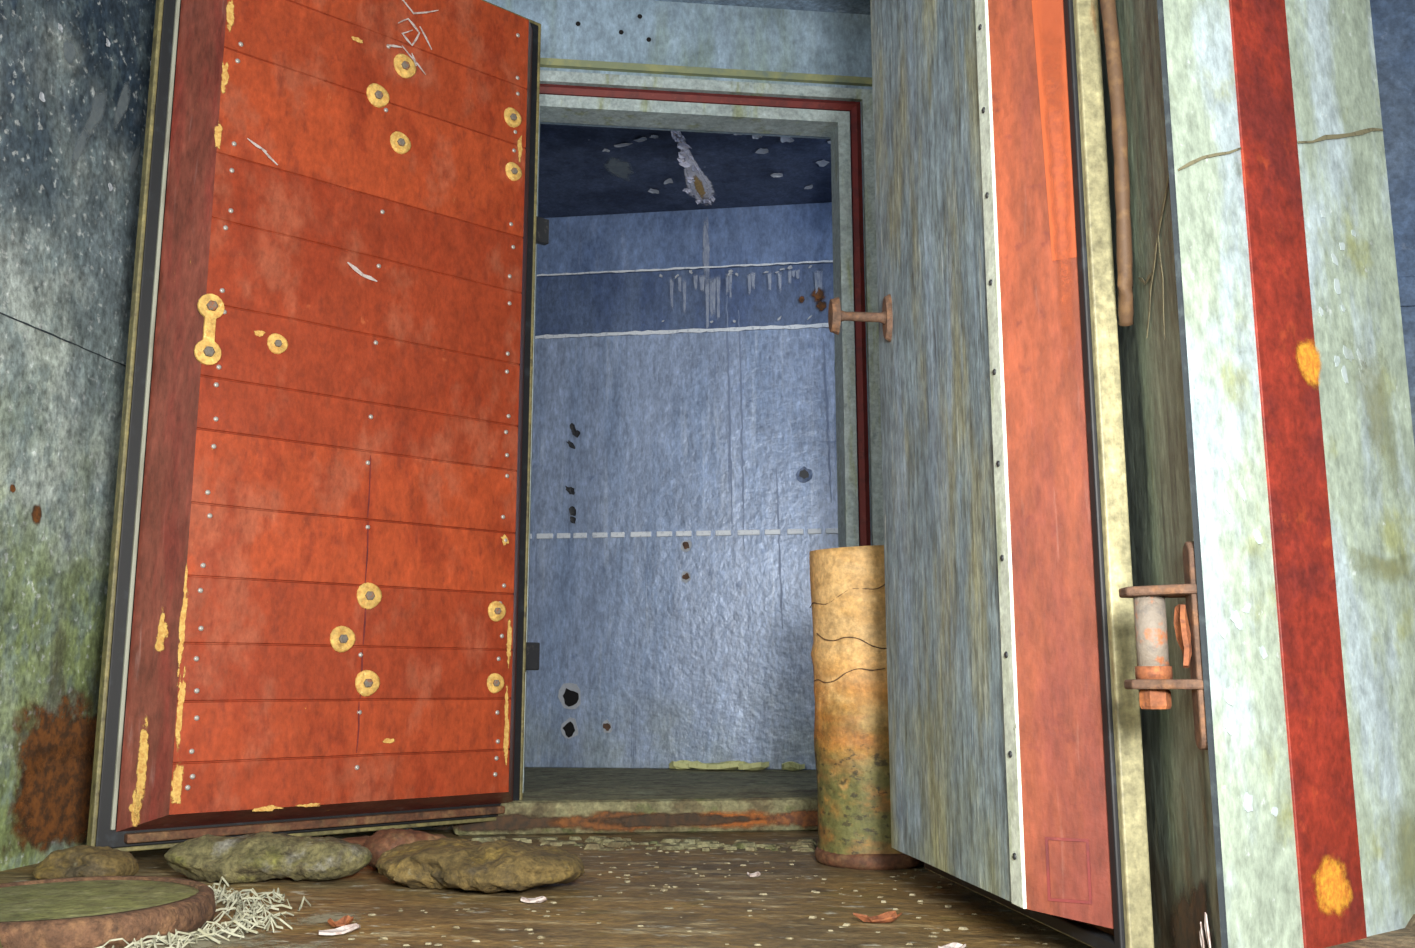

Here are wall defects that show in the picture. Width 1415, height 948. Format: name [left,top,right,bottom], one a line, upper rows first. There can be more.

rust [13,692,97,851]
rust [430,810,818,832]